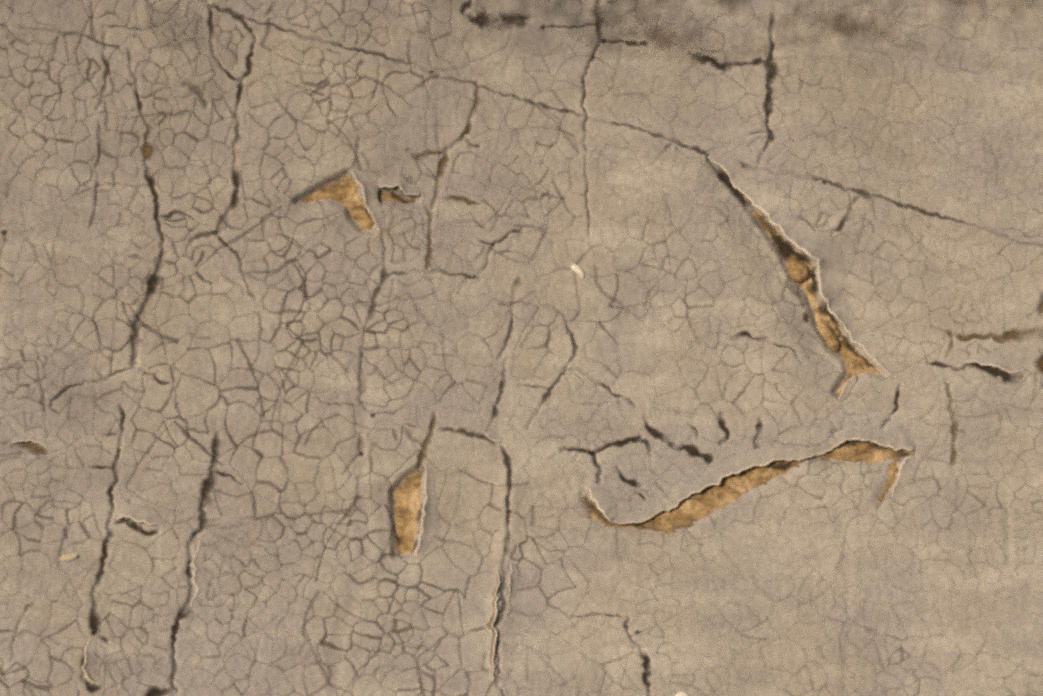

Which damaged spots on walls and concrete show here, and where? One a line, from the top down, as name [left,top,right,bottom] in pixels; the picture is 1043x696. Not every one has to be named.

crack [450,0,647,149]
crack [696,19,776,149]
crack [612,122,704,154]
peeling [301,168,421,234]
crack [815,178,962,222]
peeling [708,152,897,401]
crack [9,1,577,696]
crack [739,331,795,352]
crack [930,331,1043,396]
peeling [564,389,915,534]
peeling [392,463,441,558]
crack [578,614,650,691]